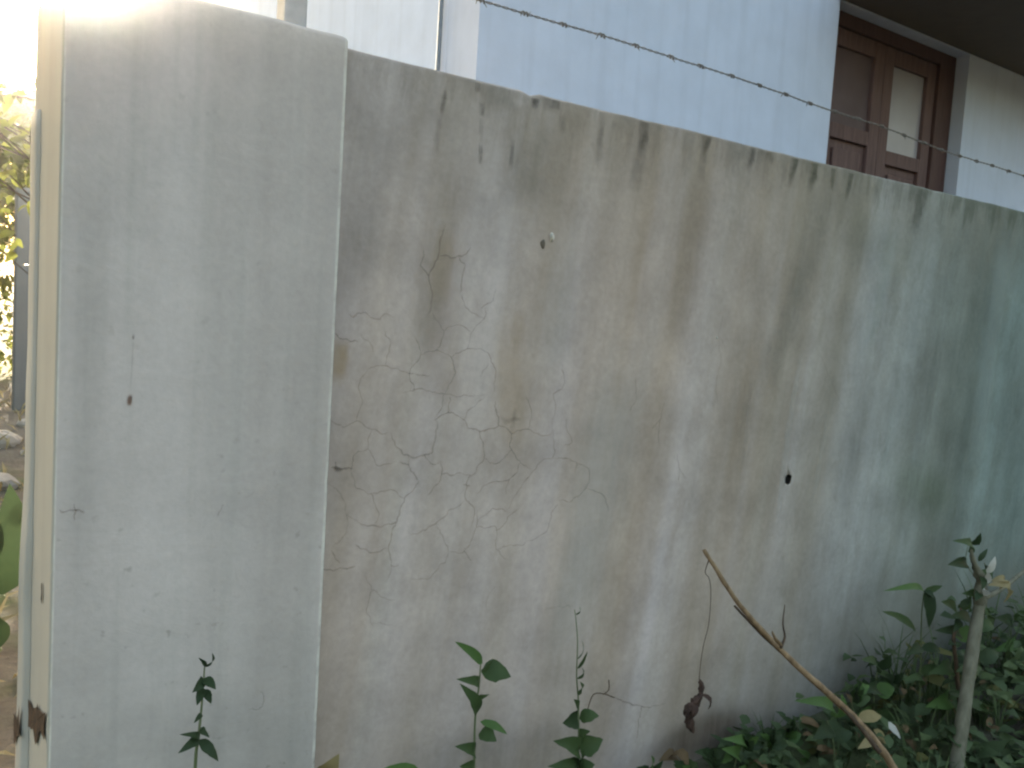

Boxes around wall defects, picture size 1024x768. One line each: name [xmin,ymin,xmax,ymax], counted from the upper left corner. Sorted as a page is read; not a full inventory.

spalling [13,700,45,744]